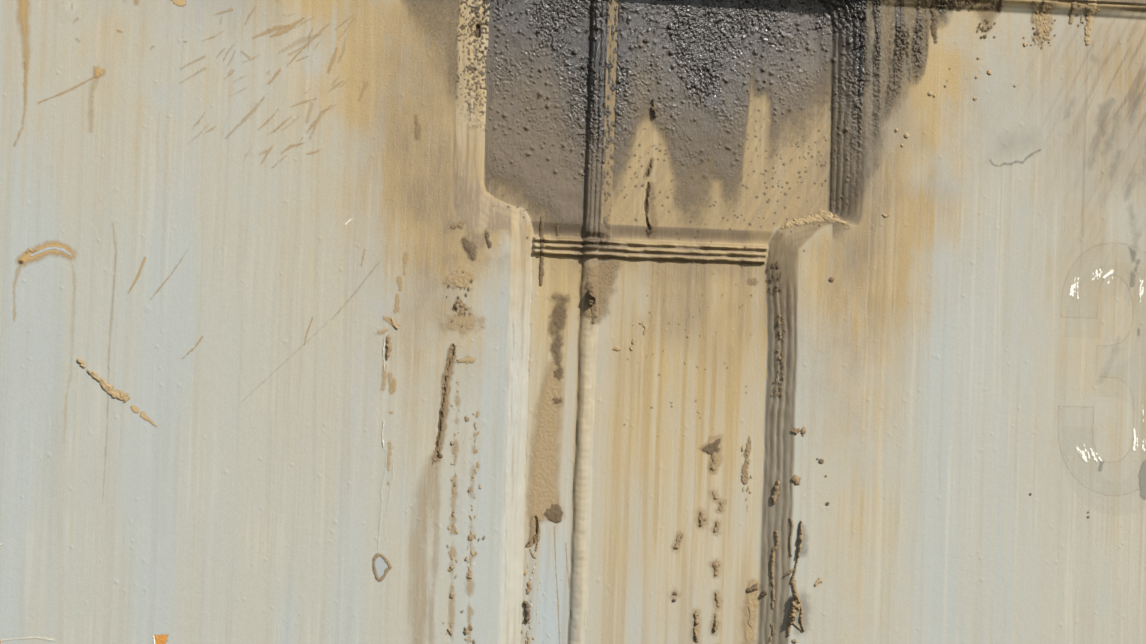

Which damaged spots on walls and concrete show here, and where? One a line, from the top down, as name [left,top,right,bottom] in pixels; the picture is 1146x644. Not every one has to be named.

damp [485,0,953,286]
spalling [19,247,71,264]
peeling [77,358,157,427]
crack [432,345,456,464]
peeling [1076,445,1102,462]